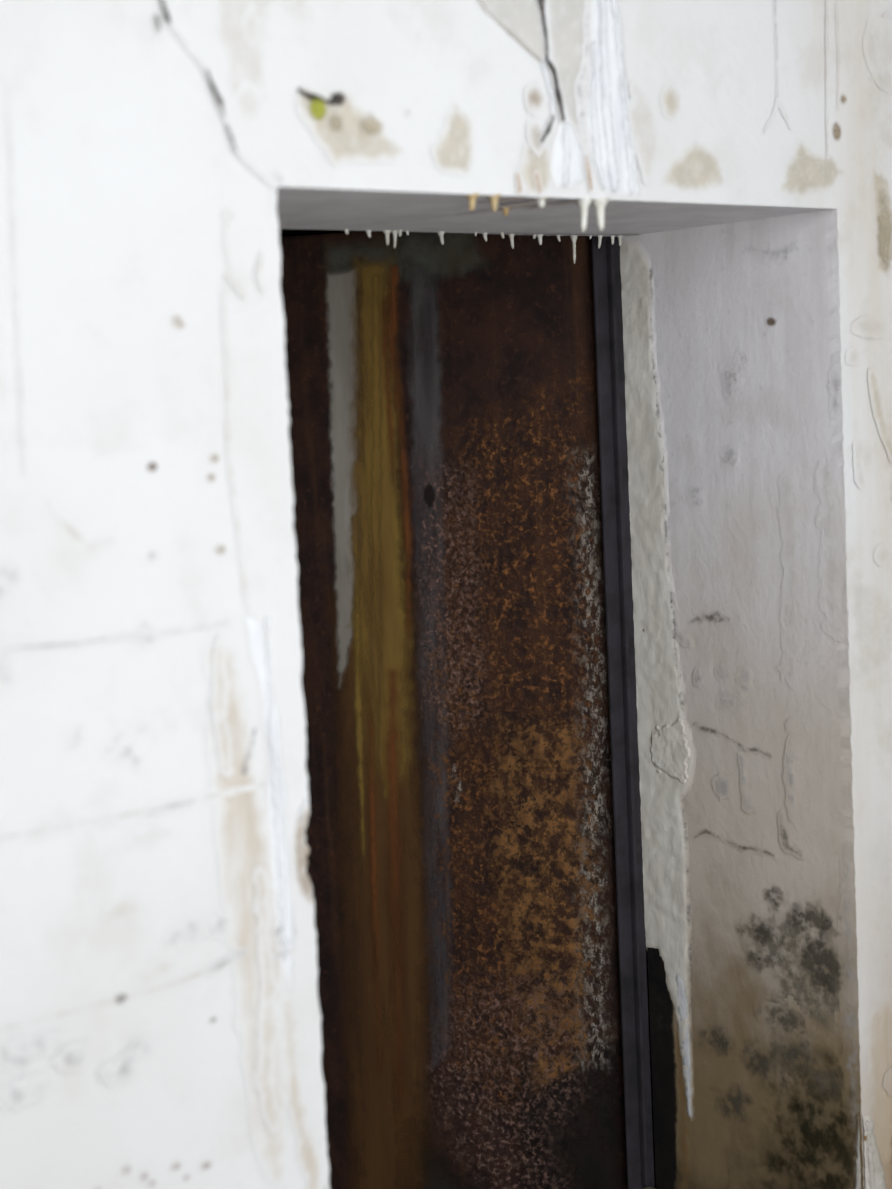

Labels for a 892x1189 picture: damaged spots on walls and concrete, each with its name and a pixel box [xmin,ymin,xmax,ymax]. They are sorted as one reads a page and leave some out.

crack [153,0,283,191]
peeling [477,0,592,150]
crack [535,0,567,146]
leakage [550,0,683,199]
rust [352,261,412,854]
peeling [620,238,698,1189]
leakage [723,858,892,1189]